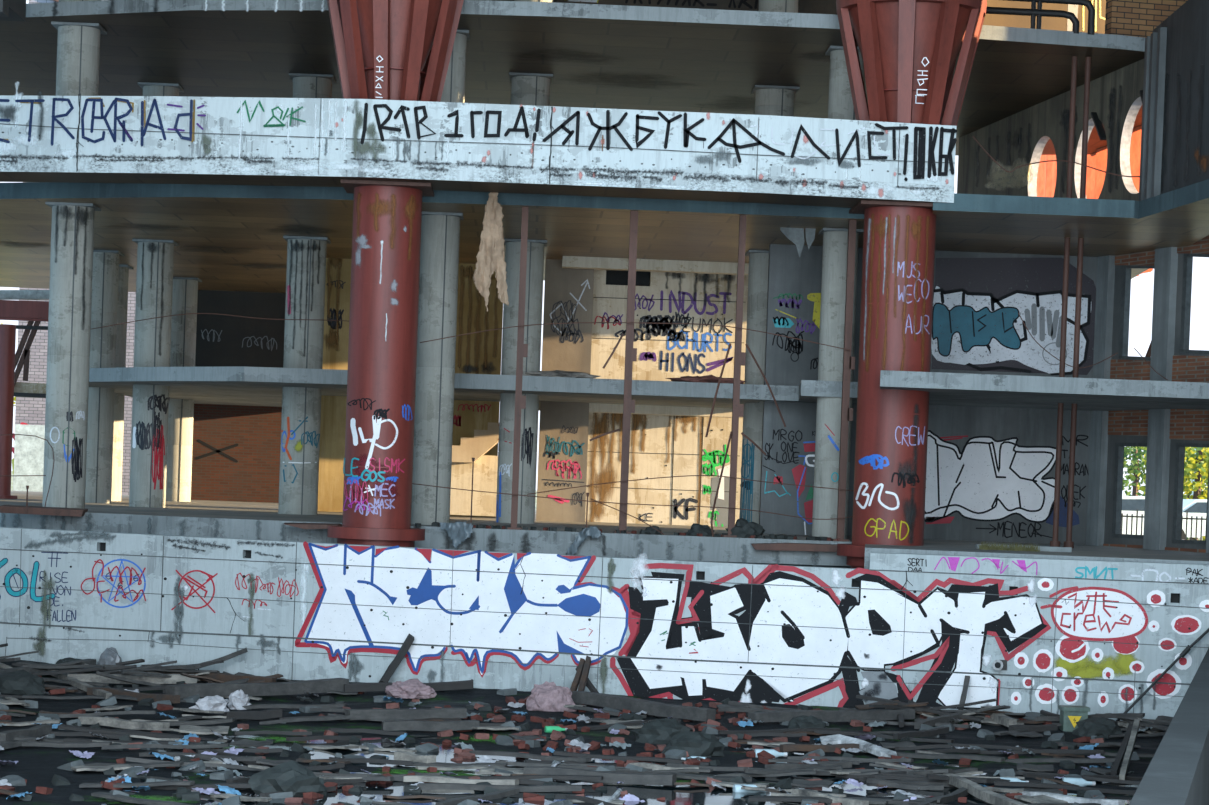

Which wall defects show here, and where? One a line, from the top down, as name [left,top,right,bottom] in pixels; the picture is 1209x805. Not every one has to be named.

leakage [0,82,43,152]
leakage [6,206,88,326]
leakage [130,225,170,356]
leakage [258,227,320,356]